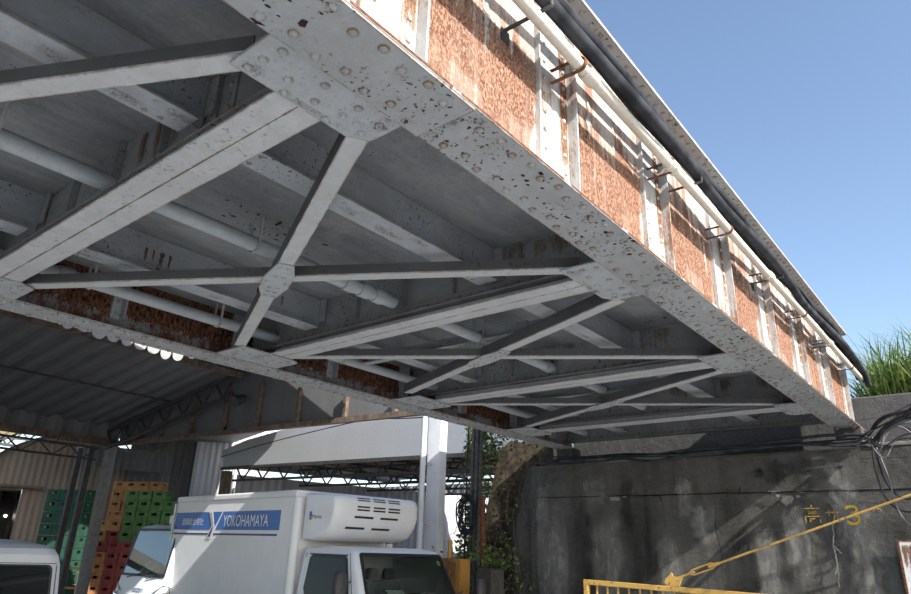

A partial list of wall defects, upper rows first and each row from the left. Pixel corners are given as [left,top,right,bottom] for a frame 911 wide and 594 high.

rust [350,0,866,431]
rust [54,254,102,273]
rust [20,280,111,314]
rust [125,286,234,347]
rust [292,359,327,374]
rust [337,359,399,393]
damp [678,483,713,539]
damp [828,465,871,558]
damp [537,492,568,594]
damp [747,539,780,594]
damp [785,515,812,576]
damp [860,569,878,594]